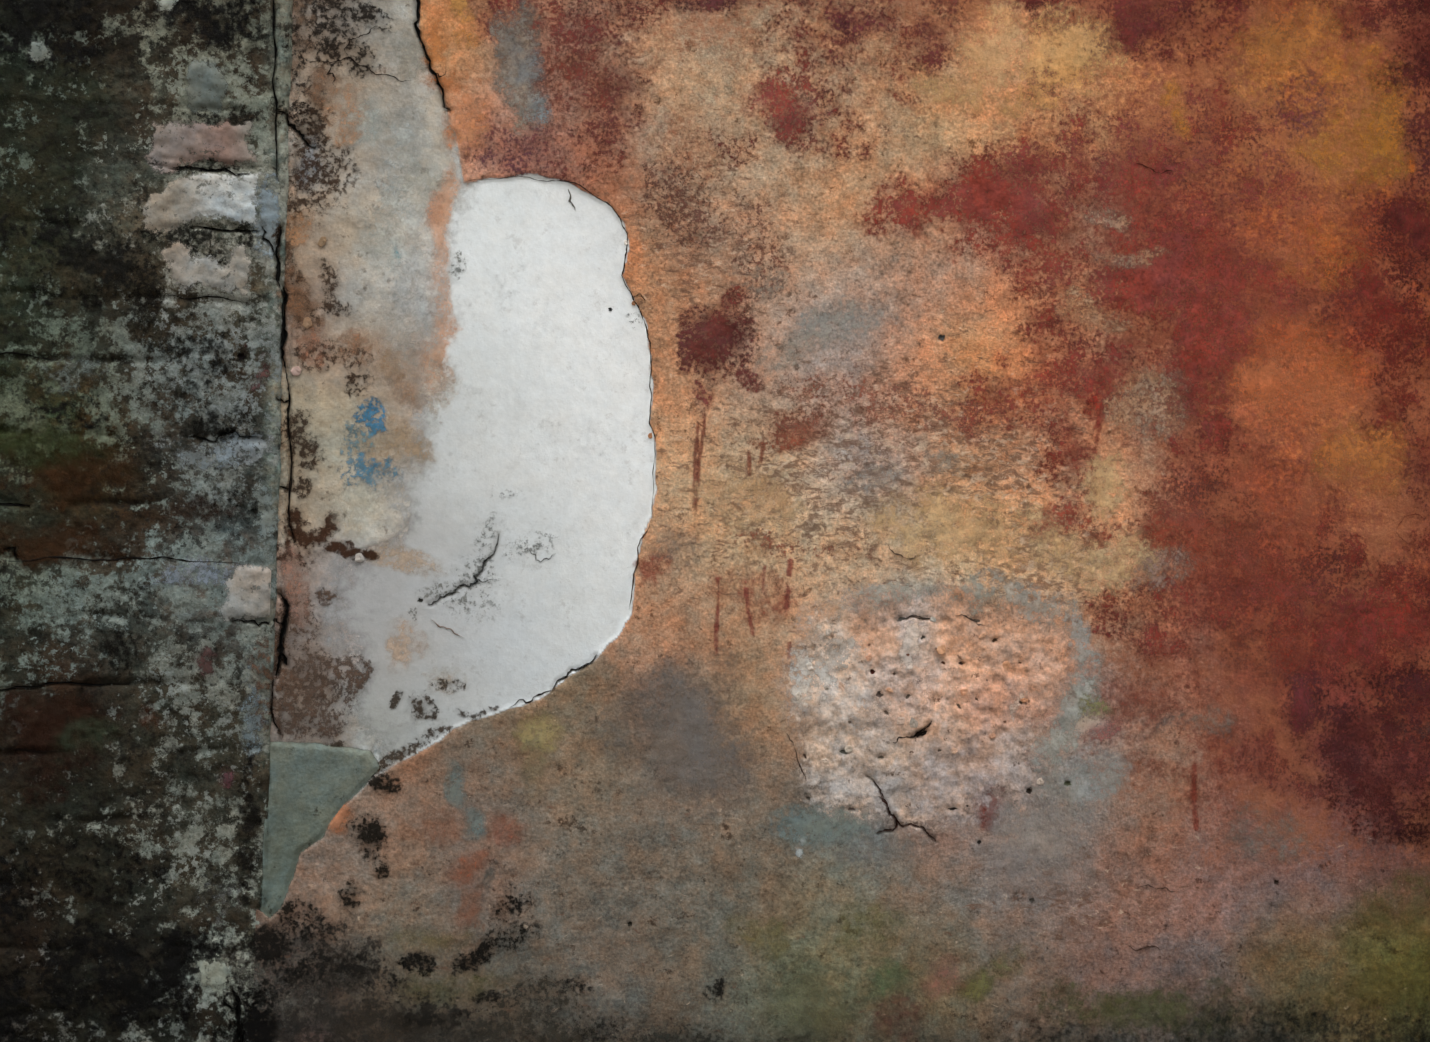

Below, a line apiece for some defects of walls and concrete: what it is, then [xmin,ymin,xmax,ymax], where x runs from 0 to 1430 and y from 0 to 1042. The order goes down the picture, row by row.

leakage [0,0,466,413]
crack [188,219,295,542]
crack [153,0,451,179]
peeling [330,804,351,833]
leakage [0,403,725,1042]
crack [466,176,656,603]
peeling [218,0,970,760]
rust [675,285,762,507]
rust [738,559,793,635]
rust [747,407,827,476]
leakage [824,450,1196,890]
flaking render [779,0,1430,851]